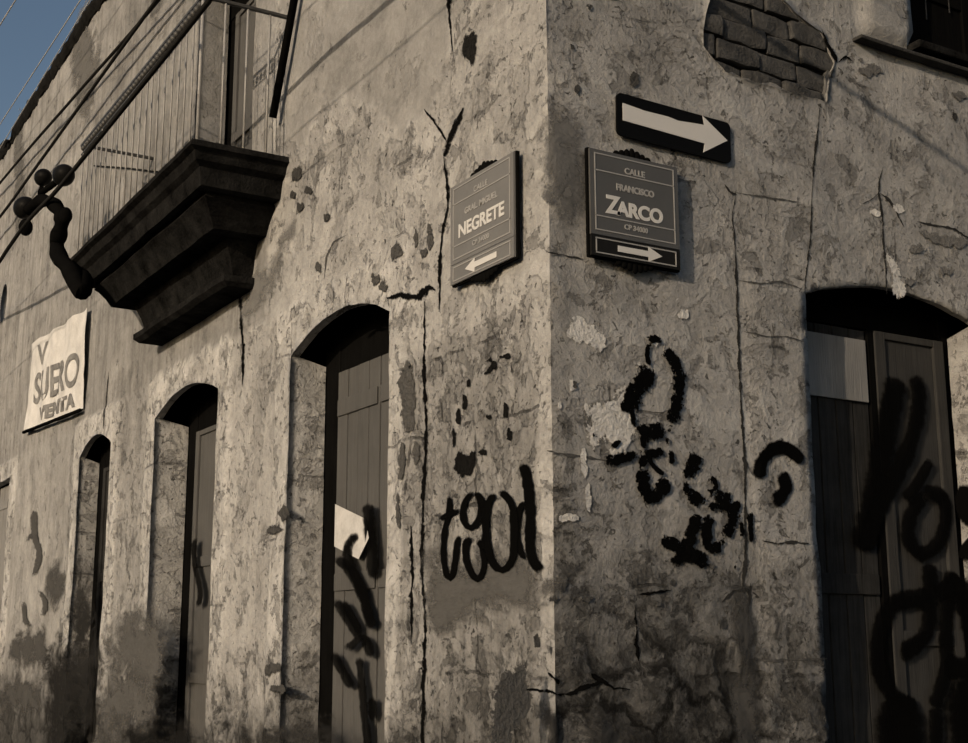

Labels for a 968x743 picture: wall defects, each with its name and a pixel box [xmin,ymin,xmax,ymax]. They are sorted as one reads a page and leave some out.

crack [445,0,453,48]
flaking render [703,0,833,108]
crack [862,169,968,293]
spalling [566,315,607,352]
crack [722,108,820,605]
damp [0,555,196,743]
crack [526,672,630,696]
crack [634,590,670,661]